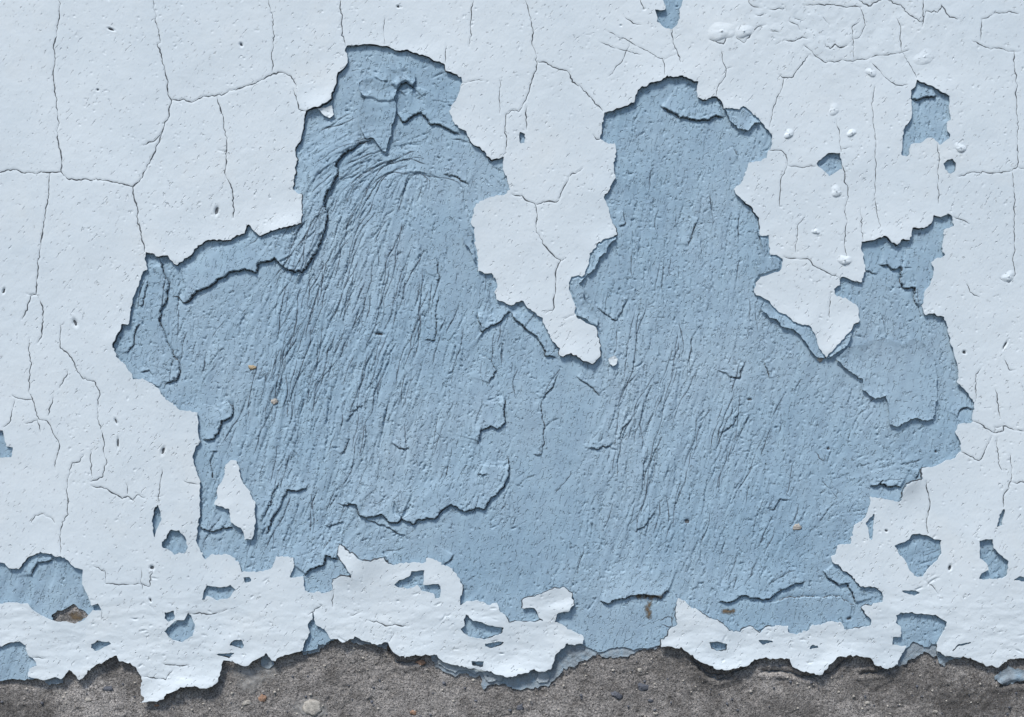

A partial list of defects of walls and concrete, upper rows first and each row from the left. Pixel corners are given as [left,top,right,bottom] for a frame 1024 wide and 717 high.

crack [604,0,681,75]
peeling [655,0,683,29]
crack [712,0,955,130]
crack [937,11,1022,283]
crack [0,0,303,552]
crack [786,127,881,317]
peeling [112,44,974,690]
crack [963,363,1024,507]
peeling [0,552,101,624]
crack [94,566,153,588]
peeling [979,539,1024,581]
peeling [0,641,64,685]